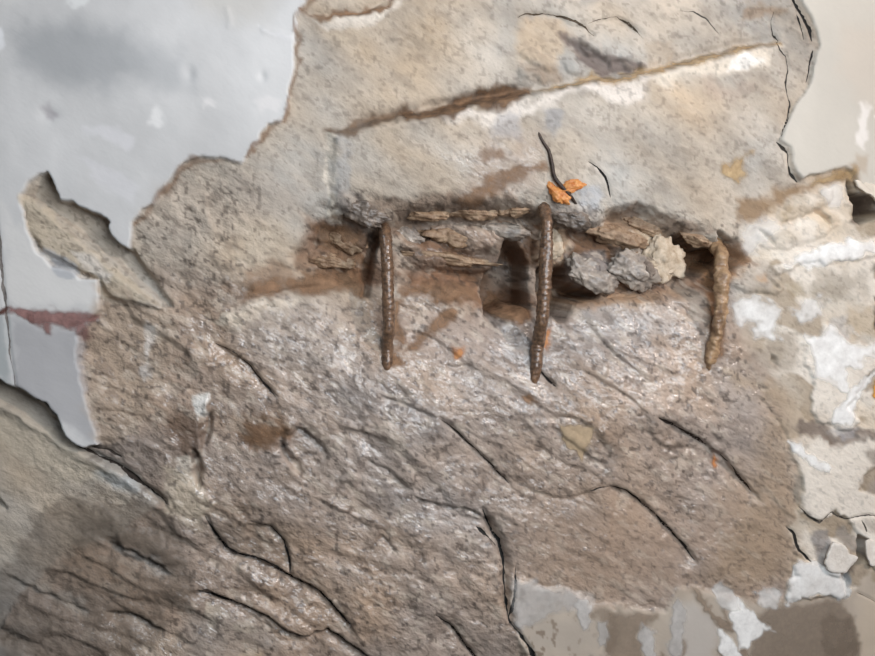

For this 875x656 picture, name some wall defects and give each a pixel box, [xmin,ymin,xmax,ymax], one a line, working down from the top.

rust [0,307,99,339]
rust [546,179,587,205]
spalling [332,44,831,252]
rust [723,243,748,271]
water stain [734,299,779,339]
crack [771,0,813,182]
peeling [717,167,875,595]
water stain [805,325,875,425]
spalling [0,379,165,630]
crack [202,516,363,652]
crack [476,510,536,656]
water stain [693,561,858,656]